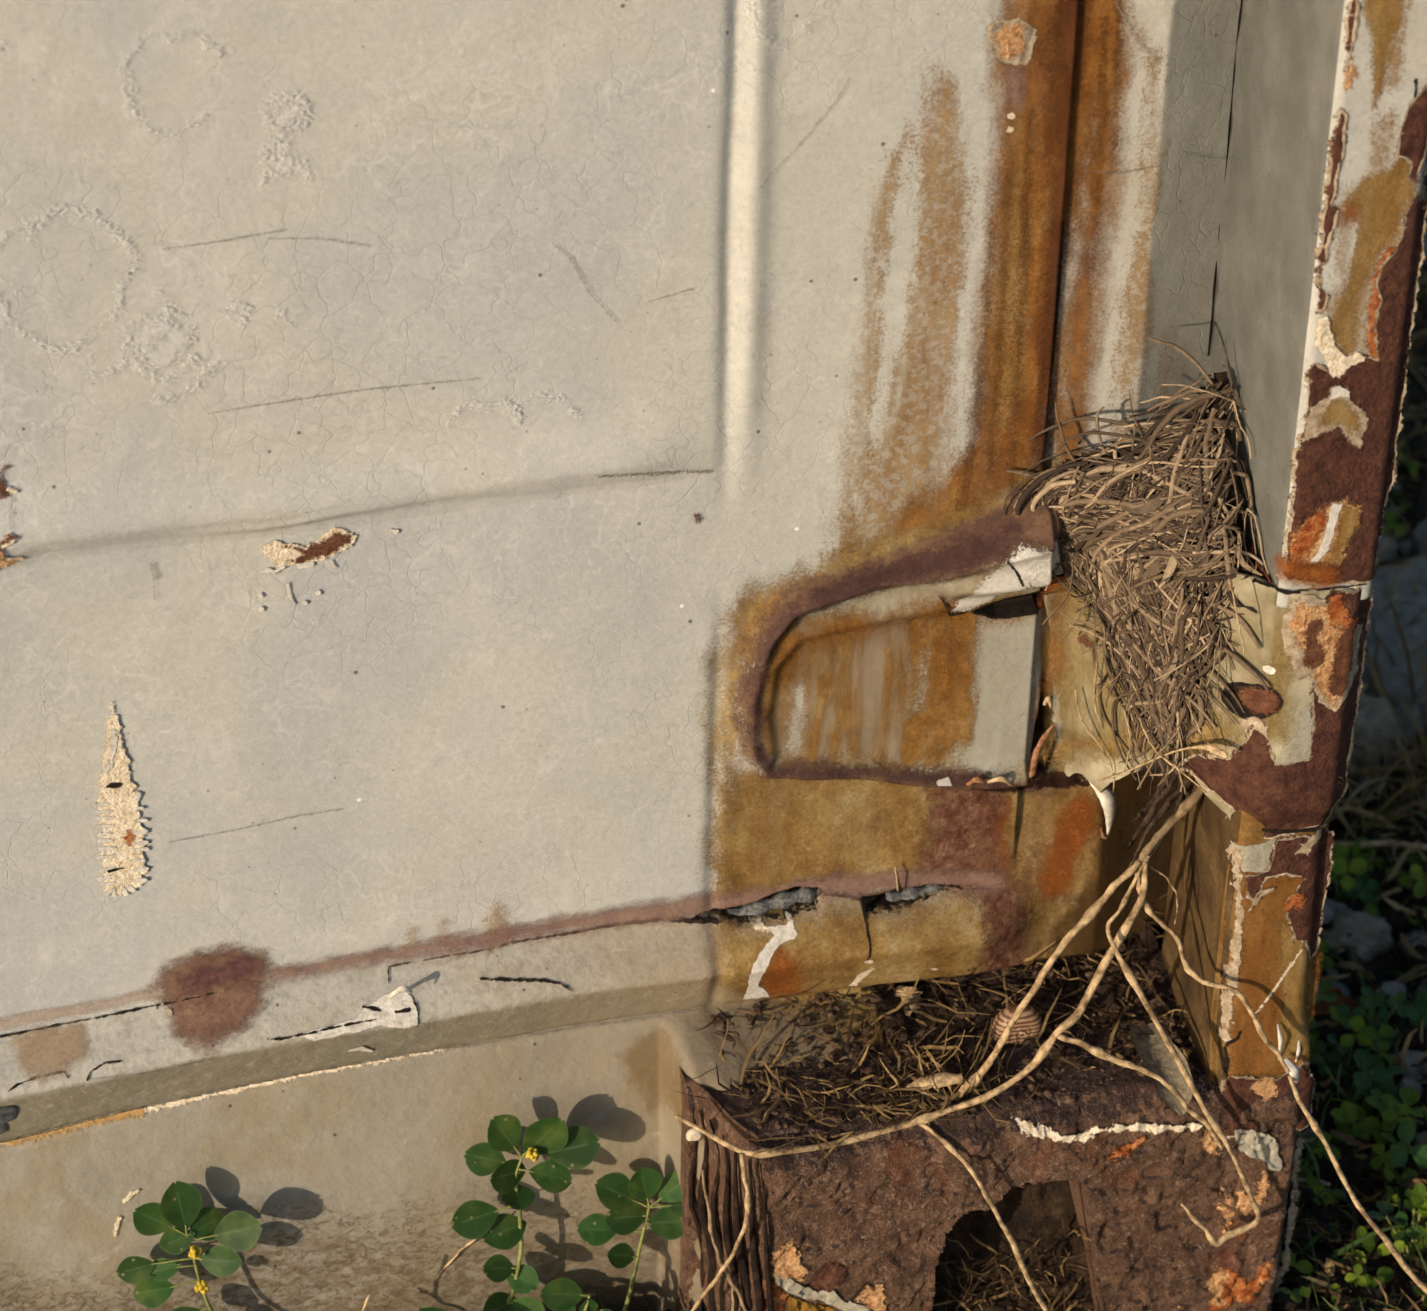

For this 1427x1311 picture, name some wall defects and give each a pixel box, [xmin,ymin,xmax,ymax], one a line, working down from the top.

corrosion [1343,0,1412,108]
peeling [1300,315,1369,449]
corrosion [0,0,1179,1051]
peeling [1289,497,1363,565]
corrosion [1177,79,1427,1139]
peeling [90,702,149,897]
crack [387,867,992,992]
peeling [743,911,798,999]
peeling [1219,838,1277,1042]
corrosion [1216,1169,1270,1237]
peeling [763,1241,887,1311]
corrosion [1205,1246,1272,1311]